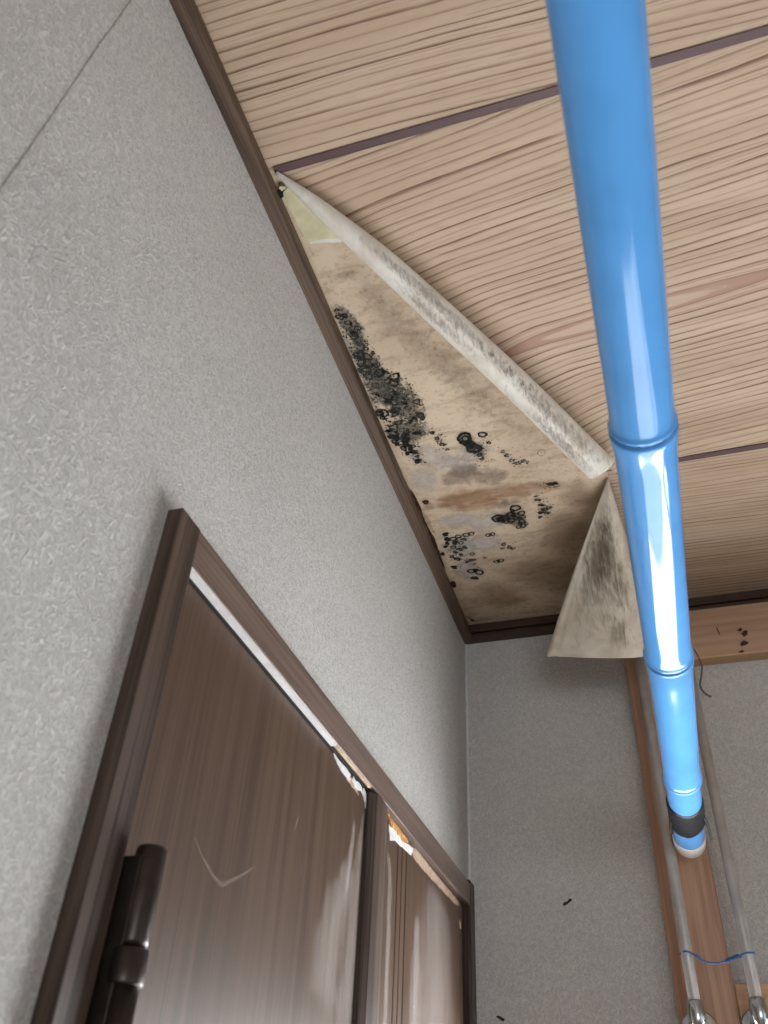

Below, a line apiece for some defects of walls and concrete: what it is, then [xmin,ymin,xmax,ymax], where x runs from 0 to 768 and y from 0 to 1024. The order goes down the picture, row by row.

leakage [334,307,563,588]
peeling [275,171,644,658]